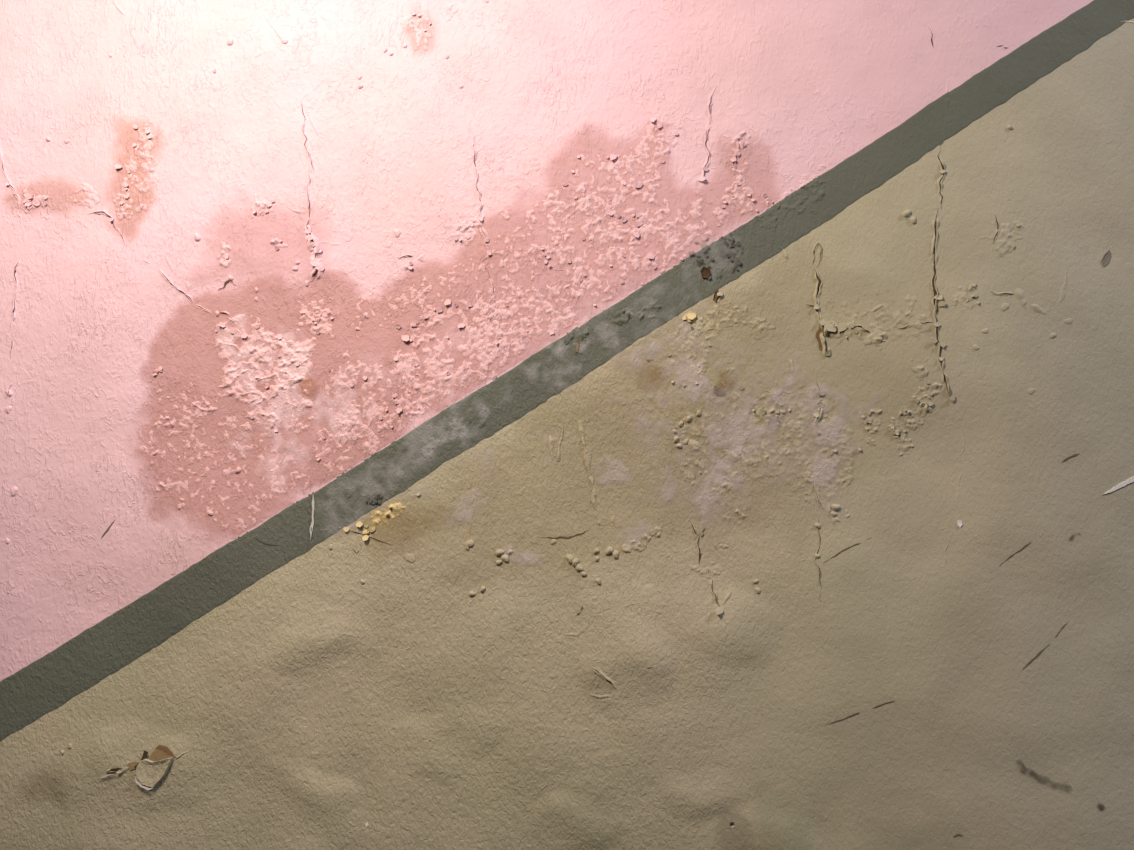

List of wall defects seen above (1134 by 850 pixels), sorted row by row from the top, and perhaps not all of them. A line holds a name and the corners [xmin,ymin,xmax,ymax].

crack [0,140,22,229]
crack [287,99,342,287]
damp [142,251,497,532]
peeling [136,108,827,541]
crack [472,136,497,298]
crack [698,86,740,207]
crack [788,82,965,504]
peeling [859,357,943,456]
peeling [621,523,663,553]
peeling [99,745,190,790]